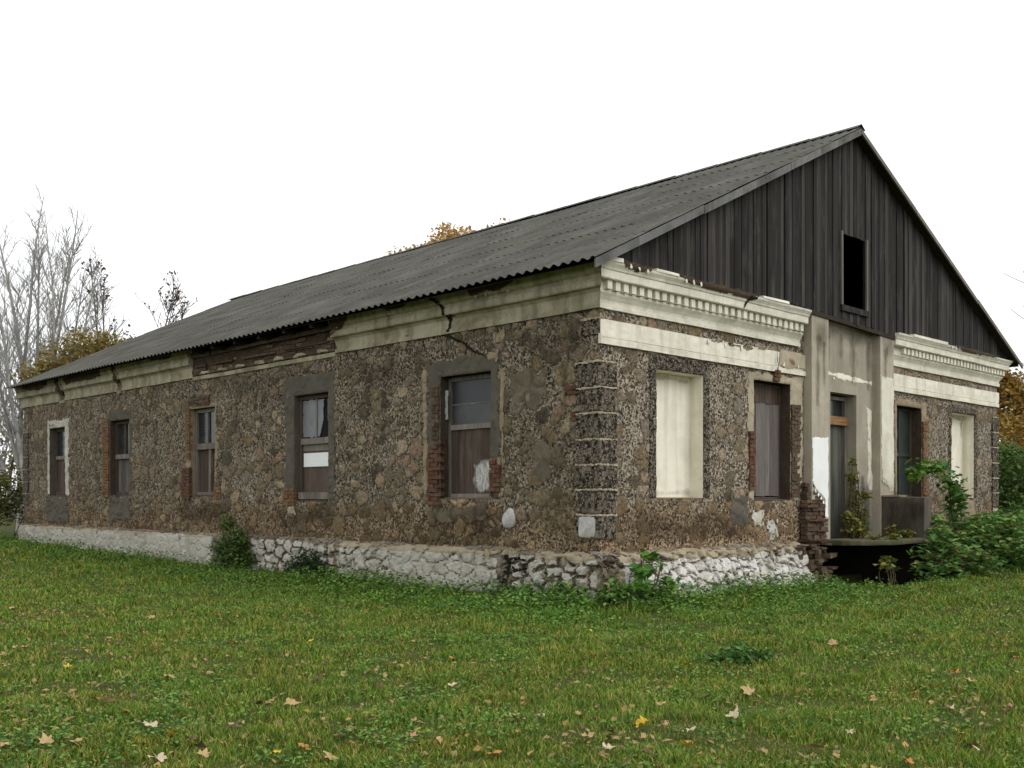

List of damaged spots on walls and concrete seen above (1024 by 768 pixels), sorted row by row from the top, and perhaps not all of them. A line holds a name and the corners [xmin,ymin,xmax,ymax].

spalling [191,316,353,376]
crack [428,297,487,358]
peeling [828,371,894,492]
peeling [622,404,829,601]